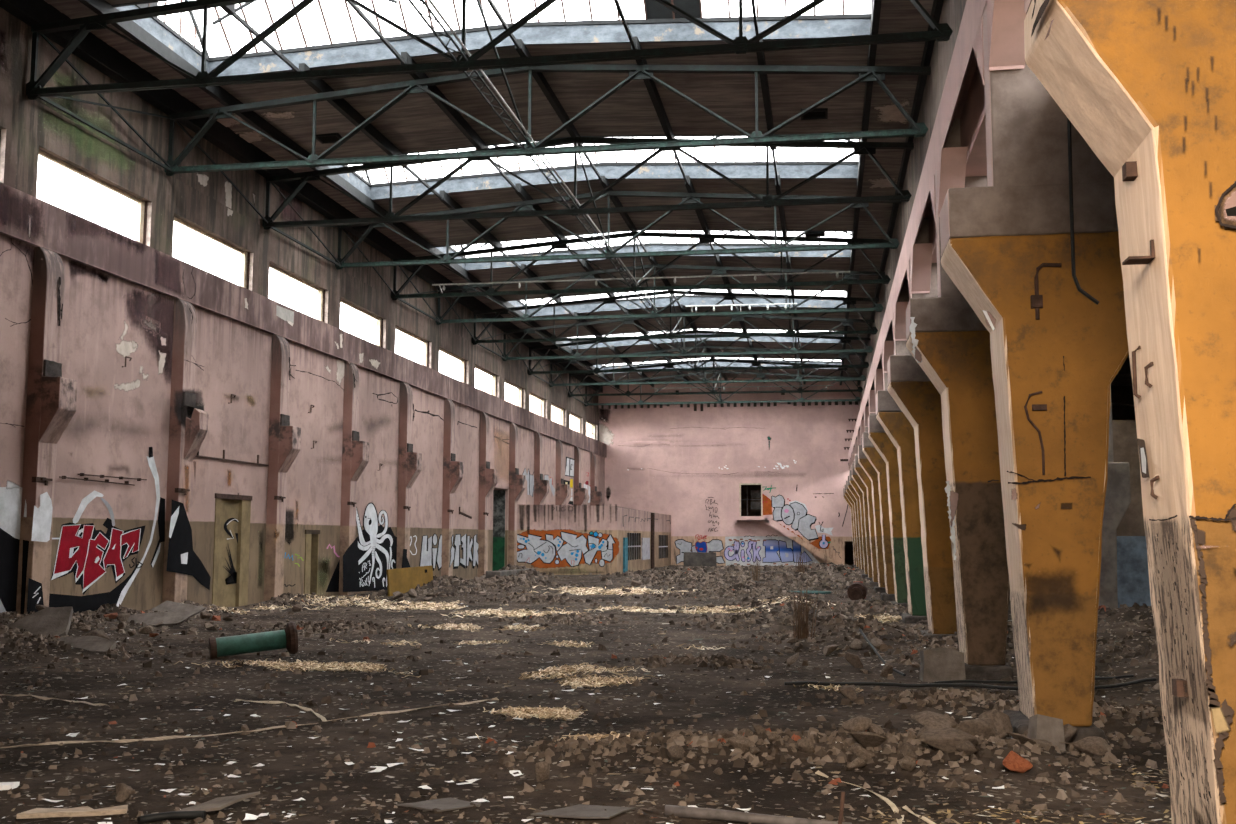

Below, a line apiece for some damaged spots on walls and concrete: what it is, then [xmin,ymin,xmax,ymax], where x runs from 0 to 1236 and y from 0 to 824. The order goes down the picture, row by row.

peeling [114,320,166,392]